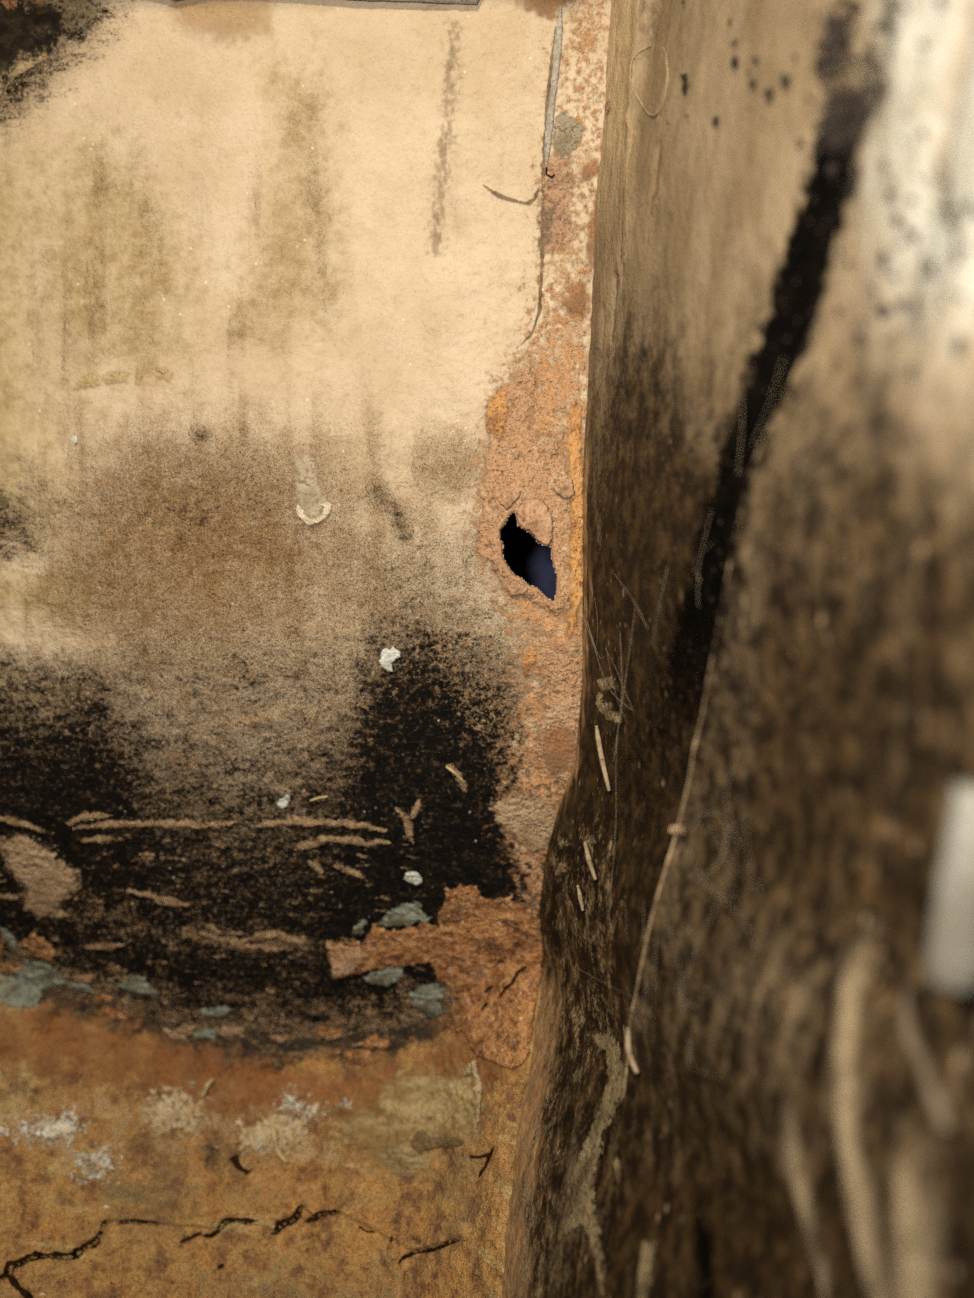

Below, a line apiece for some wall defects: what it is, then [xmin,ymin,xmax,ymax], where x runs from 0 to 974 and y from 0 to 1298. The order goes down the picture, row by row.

corrosion [464,0,612,827]
water stain [631,0,906,773]
water stain [295,452,332,526]
spalling [500,479,575,601]
peeling [352,871,432,935]
peeling [0,928,95,1010]
corrosion [0,827,548,1119]
peeling [363,966,448,1018]
water stain [0,1104,128,1185]
corrosion [230,1154,251,1174]
water stain [233,1083,353,1166]
crack [0,1205,458,1298]